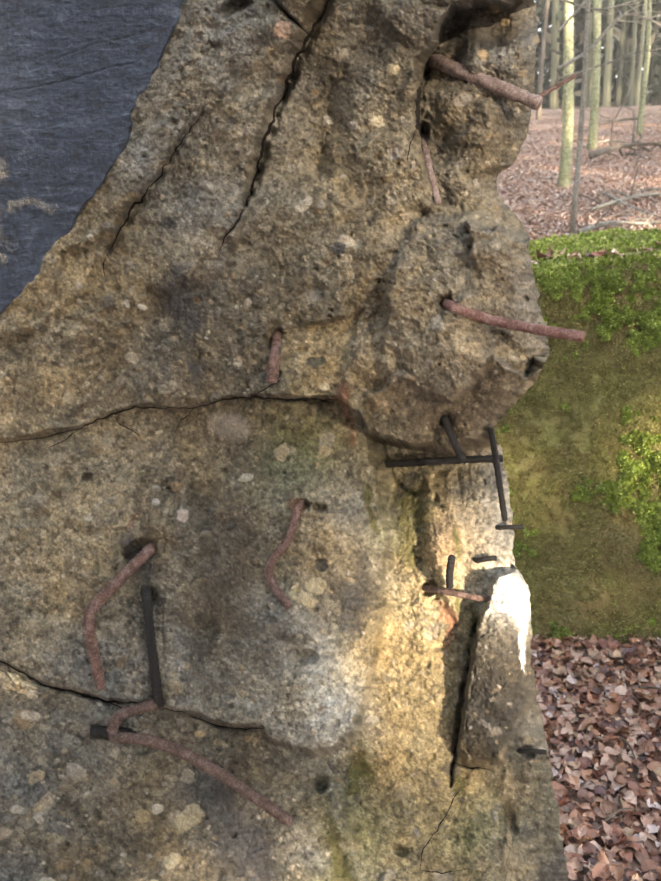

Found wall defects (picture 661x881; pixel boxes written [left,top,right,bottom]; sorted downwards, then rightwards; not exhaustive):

crack [103,111,203,275]
crack [218,0,329,254]
spalling [421,8,577,205]
crack [0,378,338,449]
spalling [384,415,524,617]
crack [0,661,263,730]
crack [420,632,486,874]